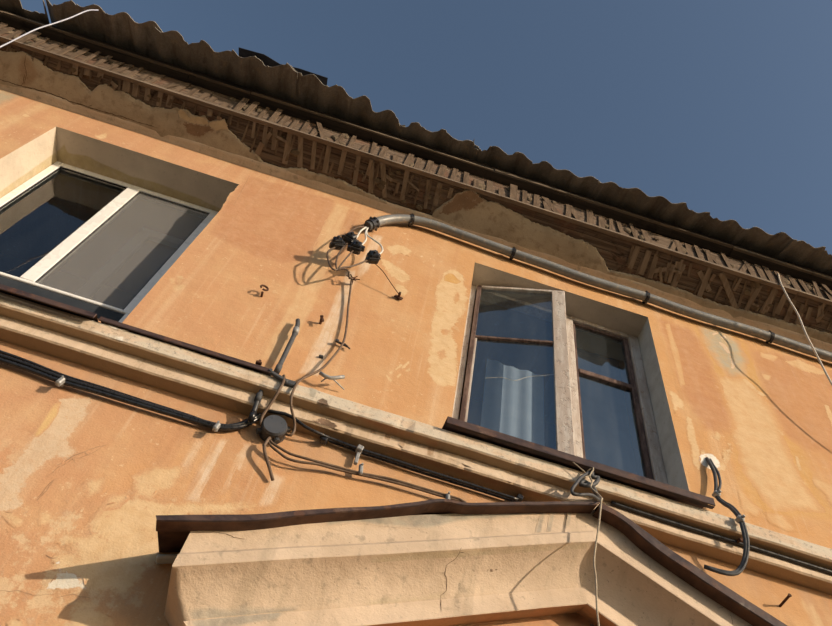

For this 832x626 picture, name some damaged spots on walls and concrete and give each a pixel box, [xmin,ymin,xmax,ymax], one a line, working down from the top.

flaking render [56,60,484,216]
peeling [427,268,469,387]
peeling [0,396,95,528]
crack [37,445,105,499]
peeling [35,465,259,626]